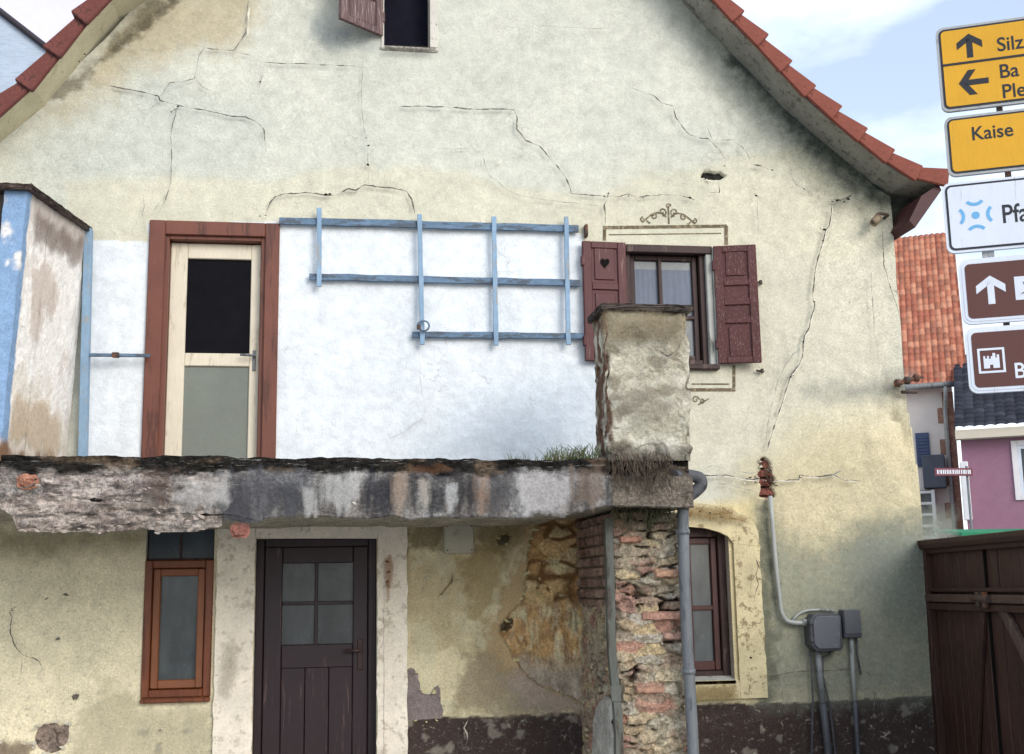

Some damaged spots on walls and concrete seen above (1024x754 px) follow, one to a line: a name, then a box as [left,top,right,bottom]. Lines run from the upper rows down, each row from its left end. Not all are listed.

crack [112,0,415,230]
spalling [701,167,727,182]
crack [401,87,863,492]
leakage [143,468,396,521]
leakage [411,470,476,512]
spalling [498,517,592,699]
crack [10,602,45,675]
peeling [407,668,444,723]
spalling [0,720,72,754]